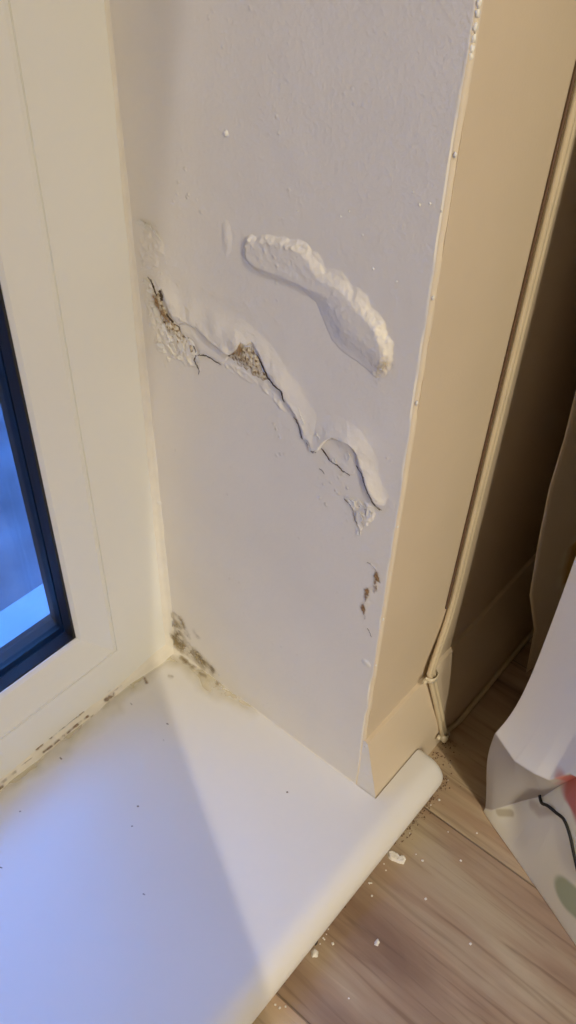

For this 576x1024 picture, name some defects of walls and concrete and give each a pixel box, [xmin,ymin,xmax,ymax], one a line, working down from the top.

crack [148,278,381,510]
peeling [140,264,395,536]
damp [171,618,213,670]